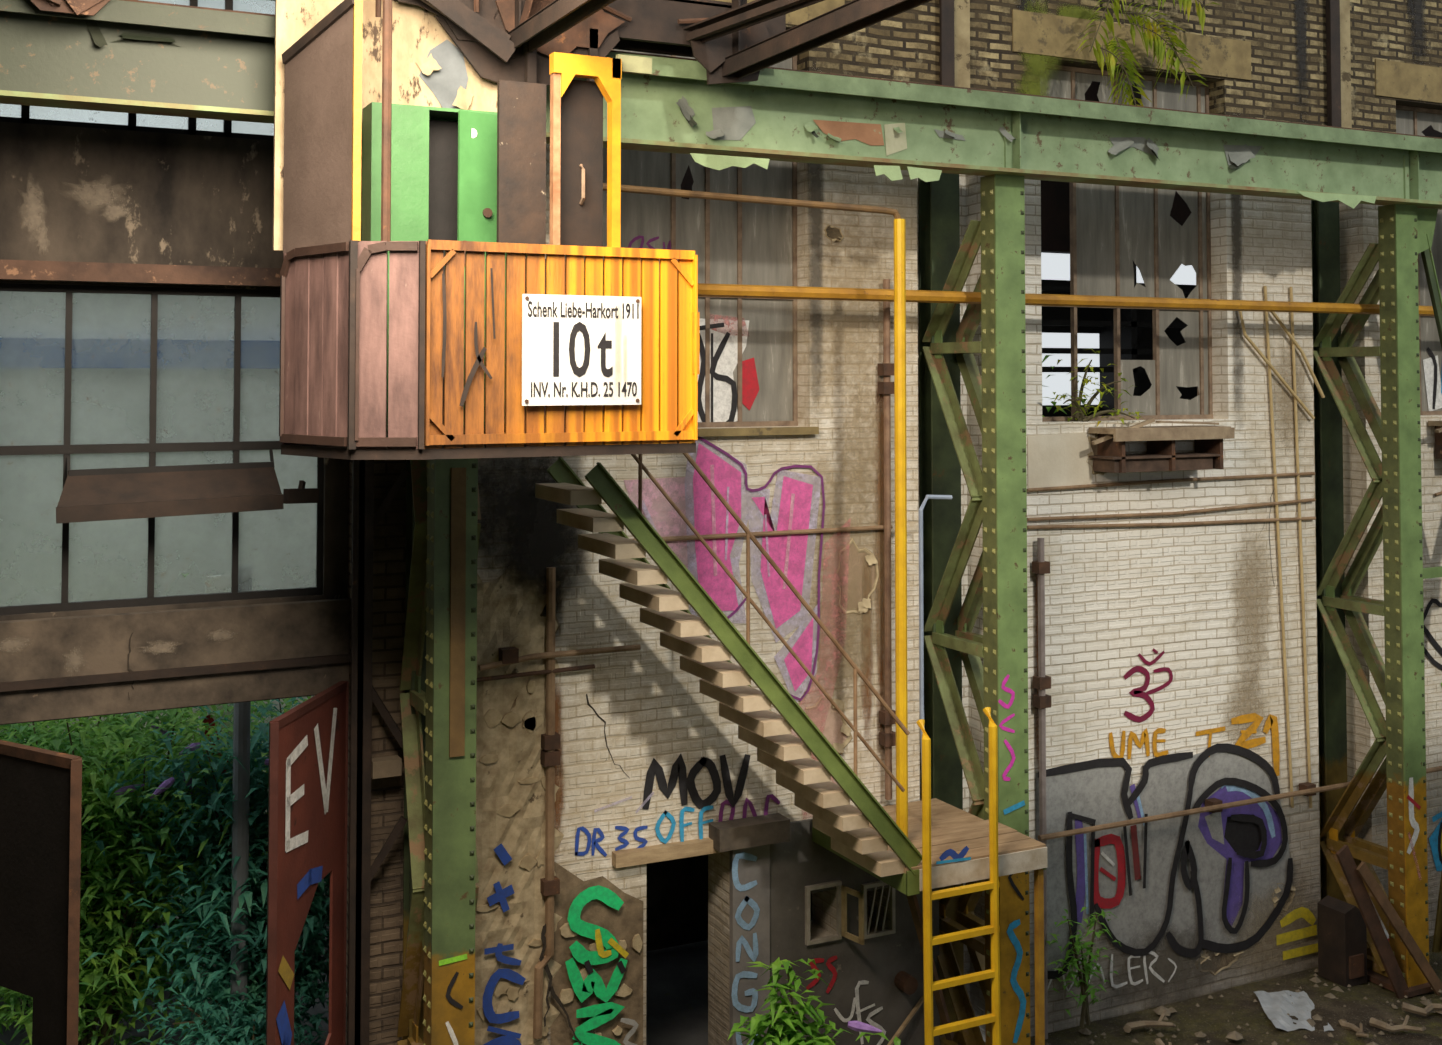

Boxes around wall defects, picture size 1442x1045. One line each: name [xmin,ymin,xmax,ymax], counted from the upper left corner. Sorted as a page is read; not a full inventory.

peeling [416,40,473,110]
peeling [676,96,770,170]
peeling [804,120,942,182]
peeling [1108,137,1159,158]
peeling [1223,144,1262,169]
peeling [22,182,48,252]
peeling [71,178,129,220]
peeling [1297,191,1377,209]
damp [1278,359,1304,440]